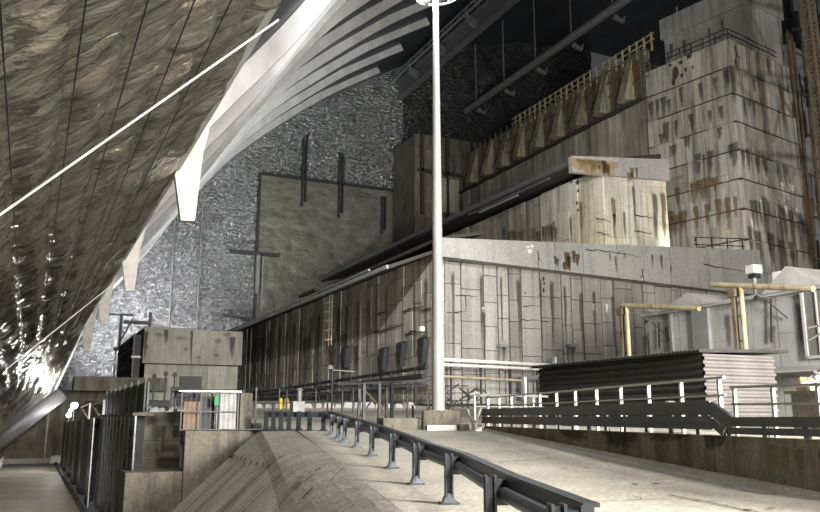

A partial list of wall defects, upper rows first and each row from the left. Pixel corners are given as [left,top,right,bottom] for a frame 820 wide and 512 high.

leakage [649,88,683,114]
leakage [659,114,694,154]
rust [572,158,617,175]
leakage [652,194,666,232]
rust [667,177,738,236]
leakage [741,149,811,257]
rust [554,251,580,270]
leakage [750,219,795,267]